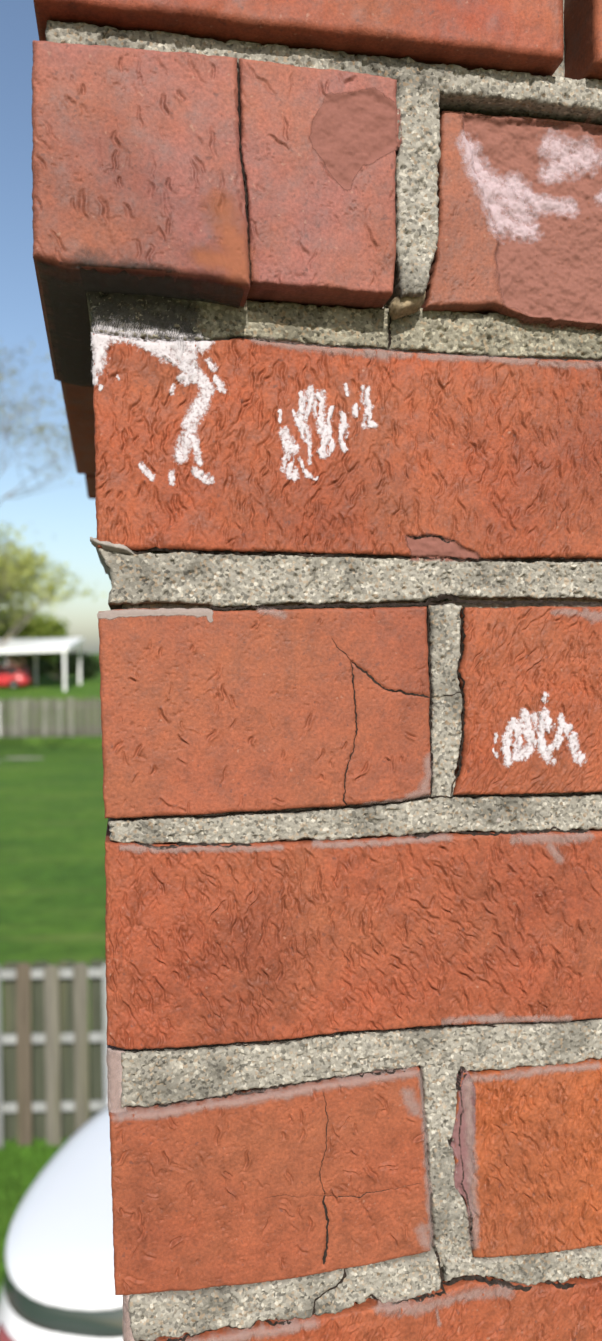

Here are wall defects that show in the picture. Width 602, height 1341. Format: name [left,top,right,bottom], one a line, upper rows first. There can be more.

crack [132,535,602,562]
spalling [406,534,480,561]
crack [125,593,602,850]
crack [113,1025,497,1053]
crack [140,1068,576,1341]